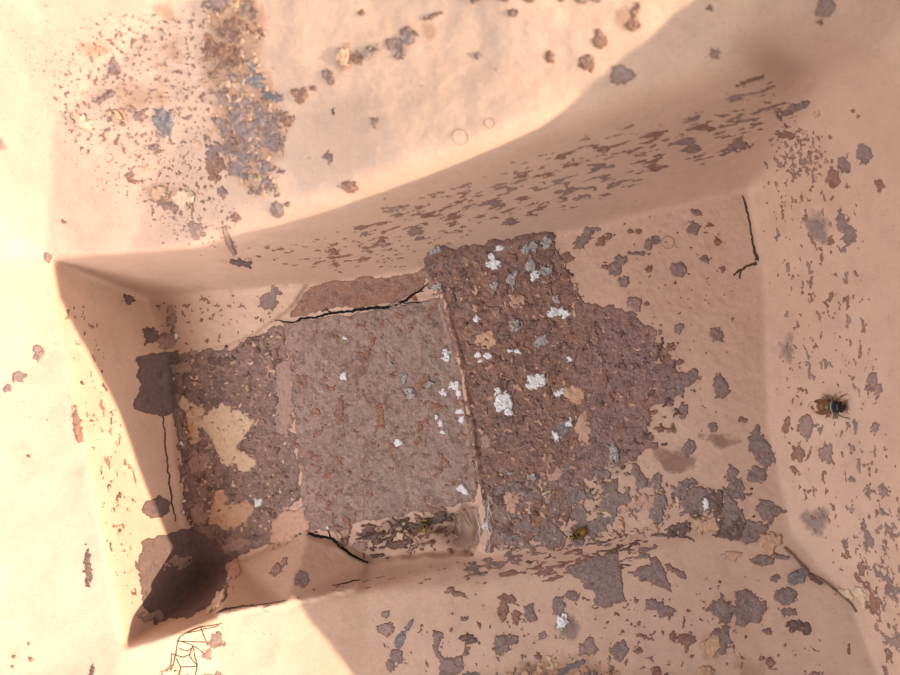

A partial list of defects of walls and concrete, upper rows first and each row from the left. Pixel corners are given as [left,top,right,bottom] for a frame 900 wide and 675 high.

peeling [152,183,195,211]
crack [733,195,759,279]
corrosion [71,340,170,519]
crack [160,372,176,521]
crack [275,283,483,497]
corrosion [105,75,900,675]
crack [295,530,368,586]
peeling [696,633,721,675]